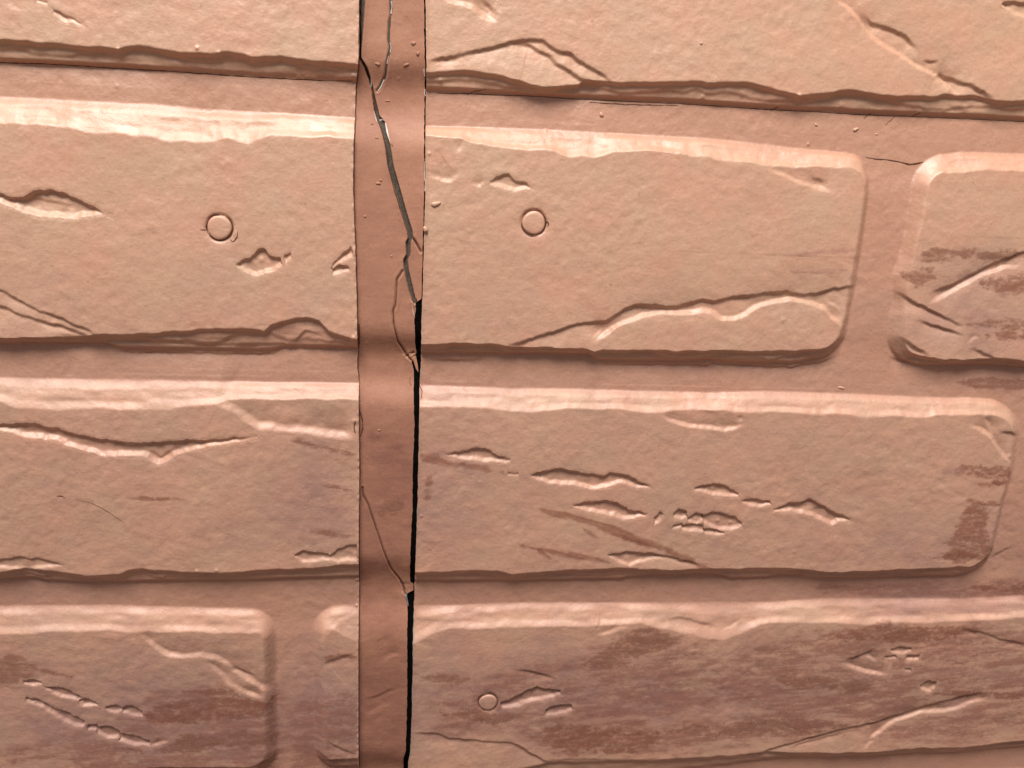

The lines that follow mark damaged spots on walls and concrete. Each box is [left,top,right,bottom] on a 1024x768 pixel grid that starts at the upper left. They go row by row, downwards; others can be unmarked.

crack [203,0,1022,768]